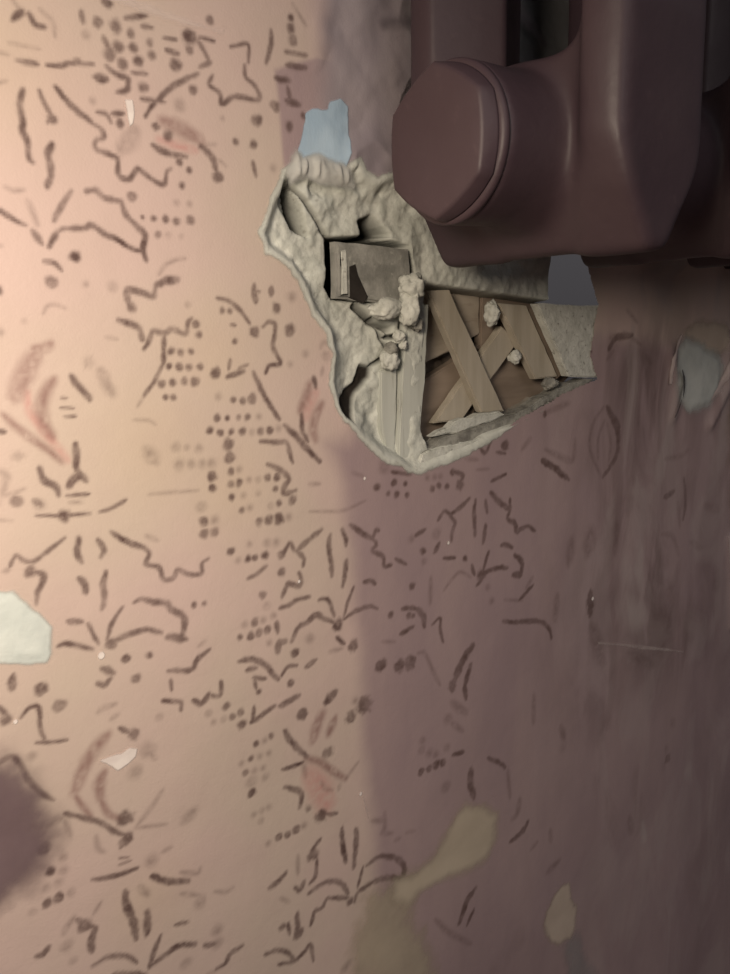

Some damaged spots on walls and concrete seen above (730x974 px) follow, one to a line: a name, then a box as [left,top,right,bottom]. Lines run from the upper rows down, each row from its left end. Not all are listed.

spalling [258,99,598,474]
peeling [669,322,730,417]
peeling [0,592,52,664]